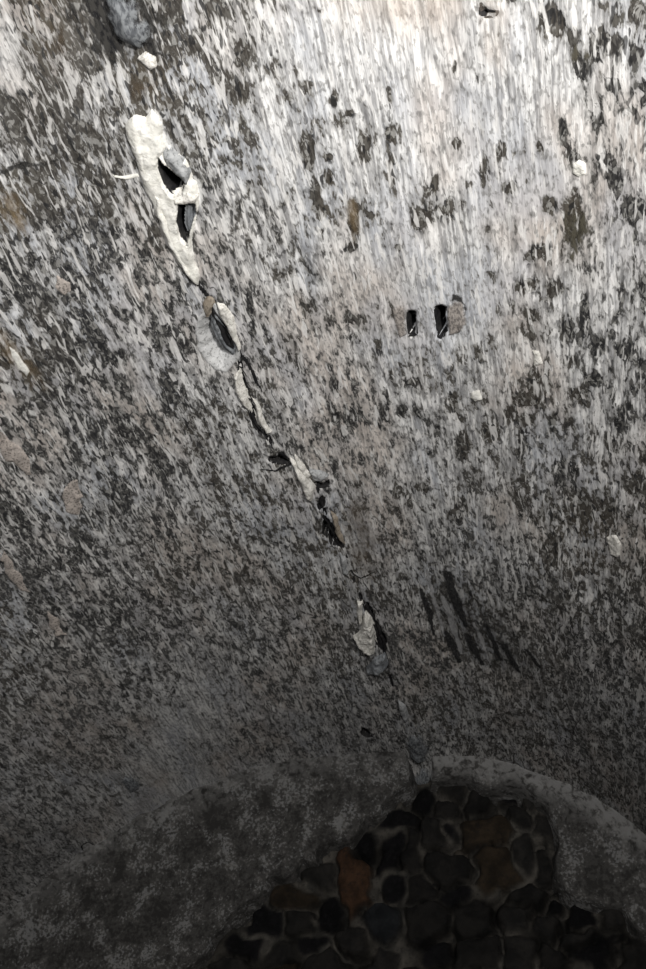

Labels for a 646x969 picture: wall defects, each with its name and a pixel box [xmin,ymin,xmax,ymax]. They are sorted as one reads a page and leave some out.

spalling [113,109,200,285]
crack [197,282,217,304]
spalling [447,294,467,335]
crack [223,326,409,723]